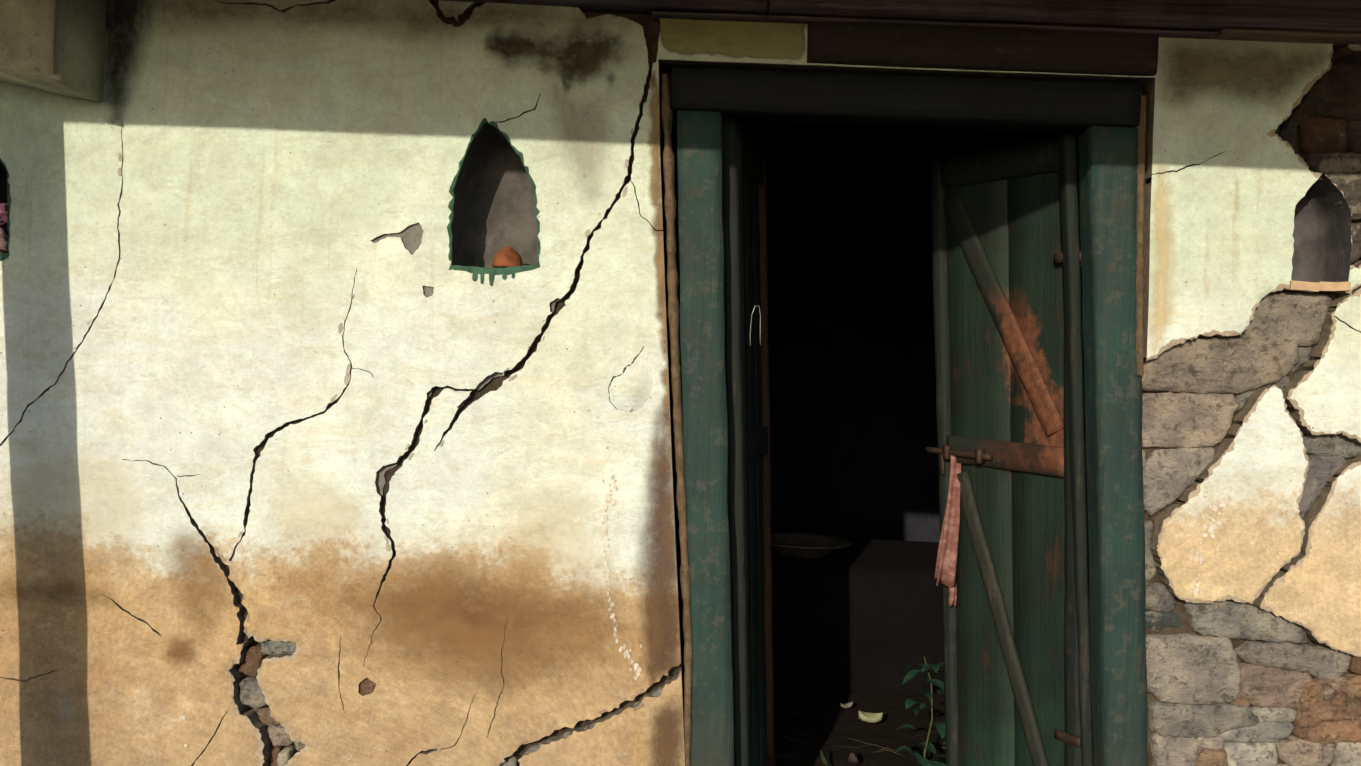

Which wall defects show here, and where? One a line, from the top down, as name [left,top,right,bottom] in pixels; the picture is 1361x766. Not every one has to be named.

damp [488,33,618,87]
spalling [1273,50,1361,265]
crack [0,118,123,446]
spalling [370,223,423,255]
crack [122,269,373,645]
crack [338,65,664,710]
spalling [1142,286,1361,766]
spalling [238,640,305,766]
spalling [358,678,376,696]
damp [357,584,596,675]
crack [406,615,682,766]
damp [653,708,680,766]